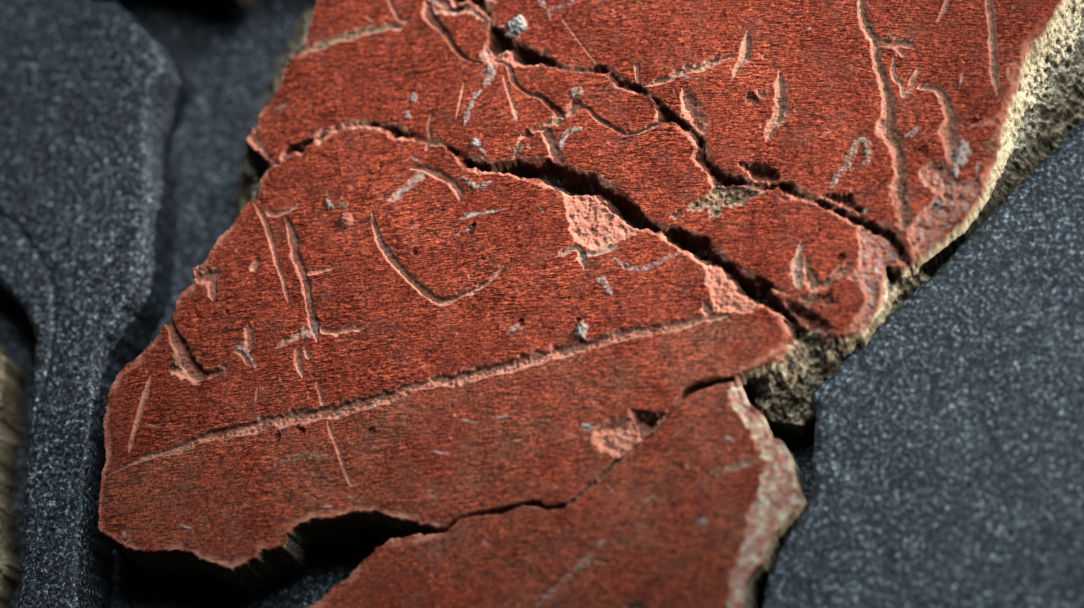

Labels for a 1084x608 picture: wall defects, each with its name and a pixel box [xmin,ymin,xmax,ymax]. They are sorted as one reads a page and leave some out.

spalling [249,258,263,272]
spalling [232,0,317,225]
crack [252,0,916,344]
spalling [556,191,639,270]
spalling [725,0,1084,608]
spalling [97,322,426,608]
crack [418,373,741,538]